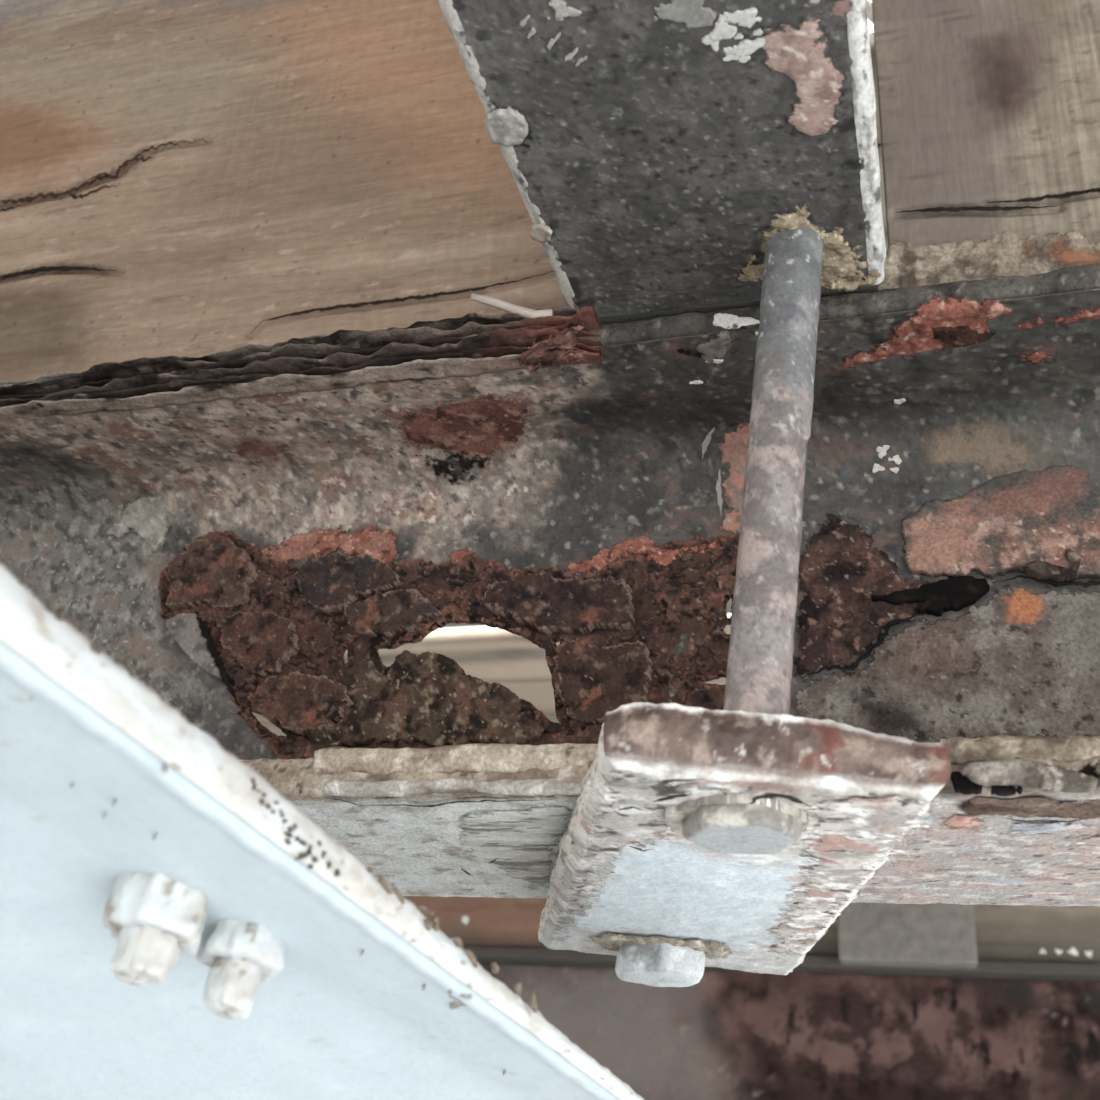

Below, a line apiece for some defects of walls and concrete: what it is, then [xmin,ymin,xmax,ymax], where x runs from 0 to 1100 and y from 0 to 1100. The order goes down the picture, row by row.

peeling [653,0,851,136]
crack [0,139,208,211]
crack [899,188,1100,213]
crack [0,266,117,280]
crack [992,575,1100,587]
rust [158,531,740,798]
peeling [550,772,752,941]
peeling [766,792,984,959]
rust [724,976,1100,1093]